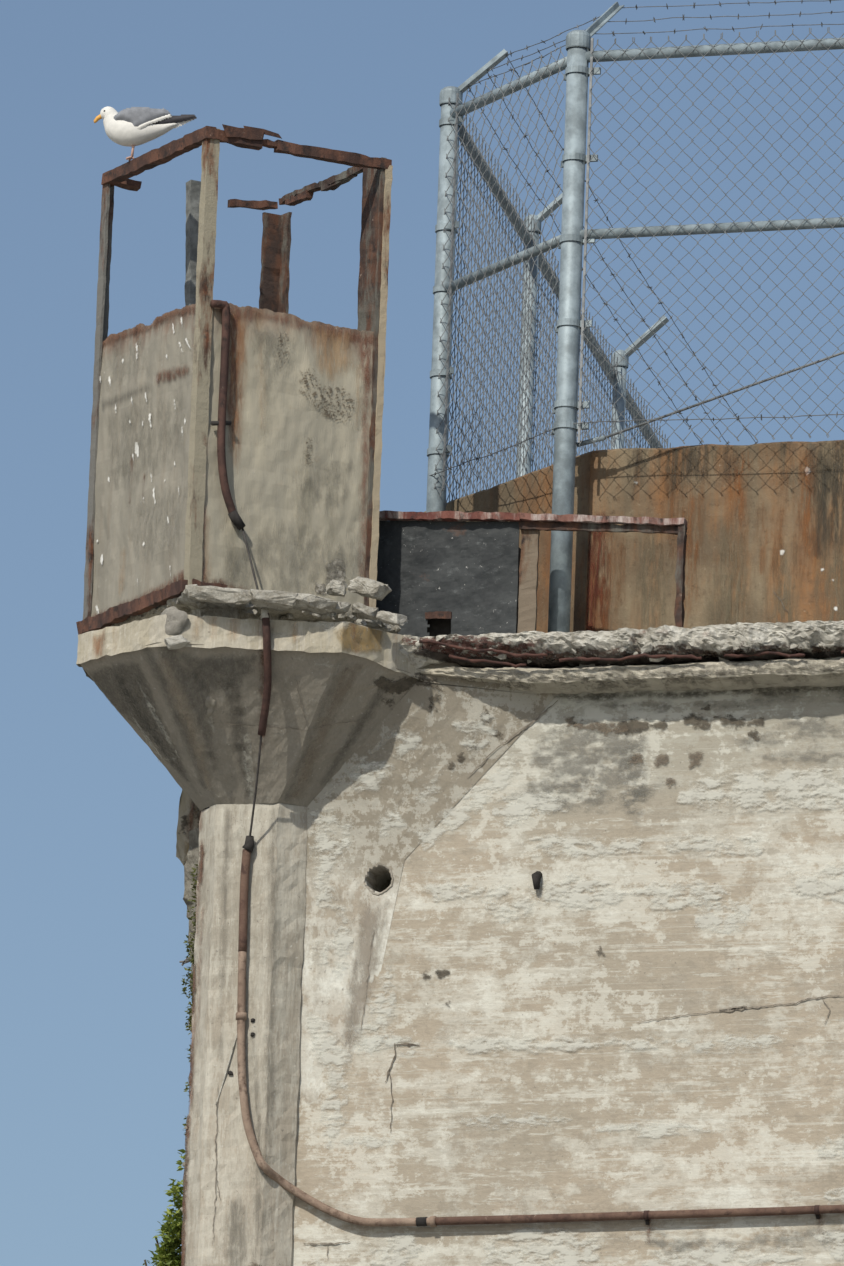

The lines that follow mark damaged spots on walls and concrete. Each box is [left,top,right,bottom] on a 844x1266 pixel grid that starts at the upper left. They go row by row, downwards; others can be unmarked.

rust [156,369,187,381]
peeling [185,559,387,627]
rust [586,531,608,631]
water stain [350,907,377,1040]
crack [638,995,842,1024]
crack [385,1043,419,1133]